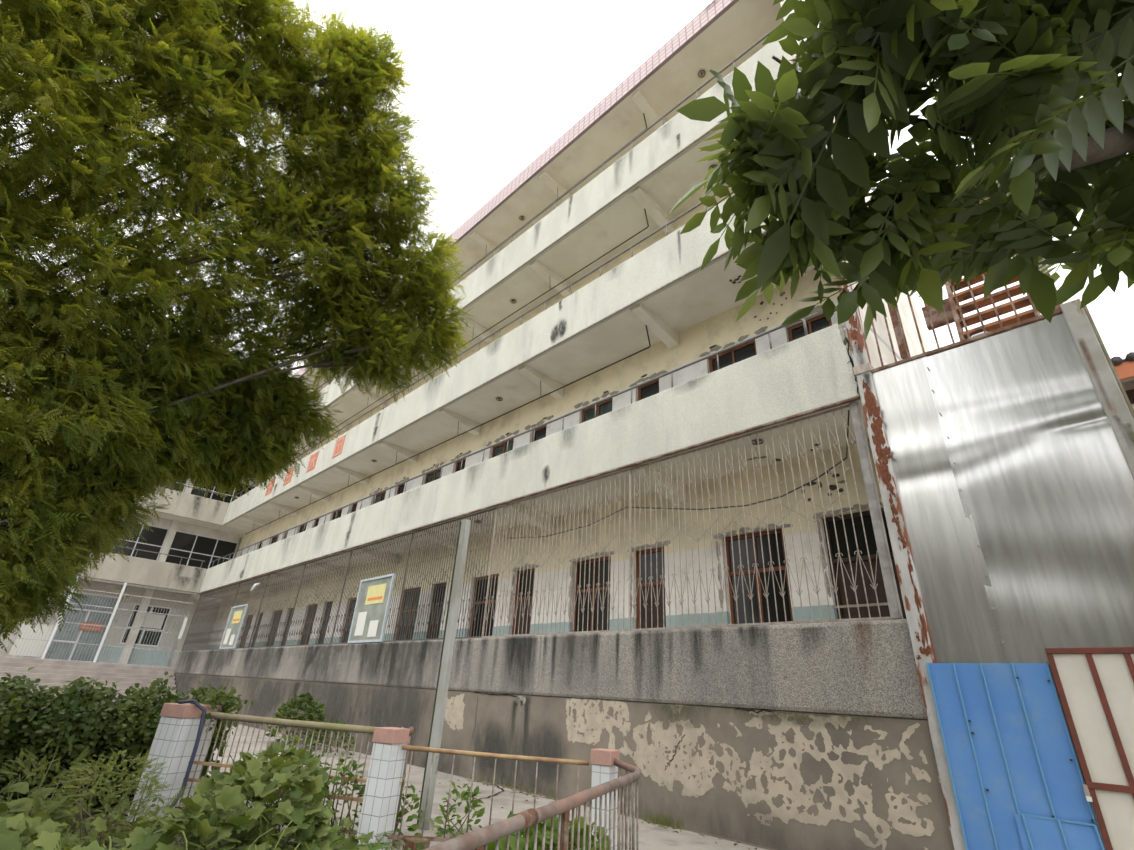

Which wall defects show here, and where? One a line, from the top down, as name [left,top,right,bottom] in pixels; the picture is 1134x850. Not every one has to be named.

corrosion [863,373,931,660]
water stain [509,634,598,671]
peeling [566,698,941,850]